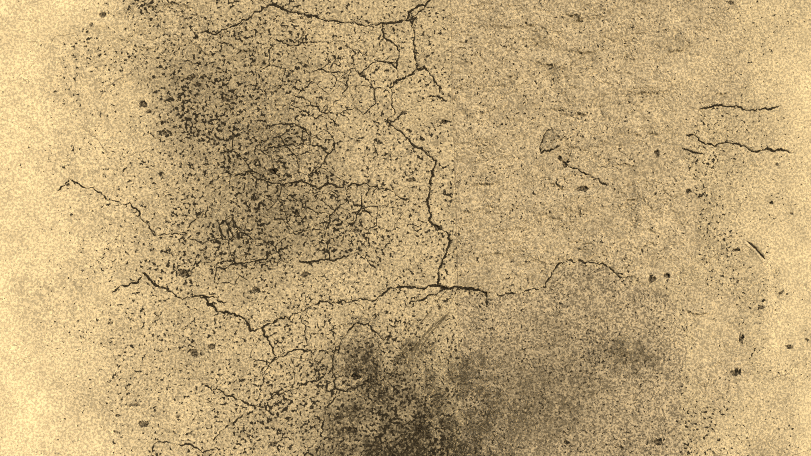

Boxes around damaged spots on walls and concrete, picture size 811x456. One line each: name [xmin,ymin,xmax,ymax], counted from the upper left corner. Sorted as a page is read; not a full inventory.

flaking render [440,0,753,298]
crack [682,104,794,154]
crack [58,0,632,455]
water stain [396,289,448,366]
water stain [323,345,480,456]